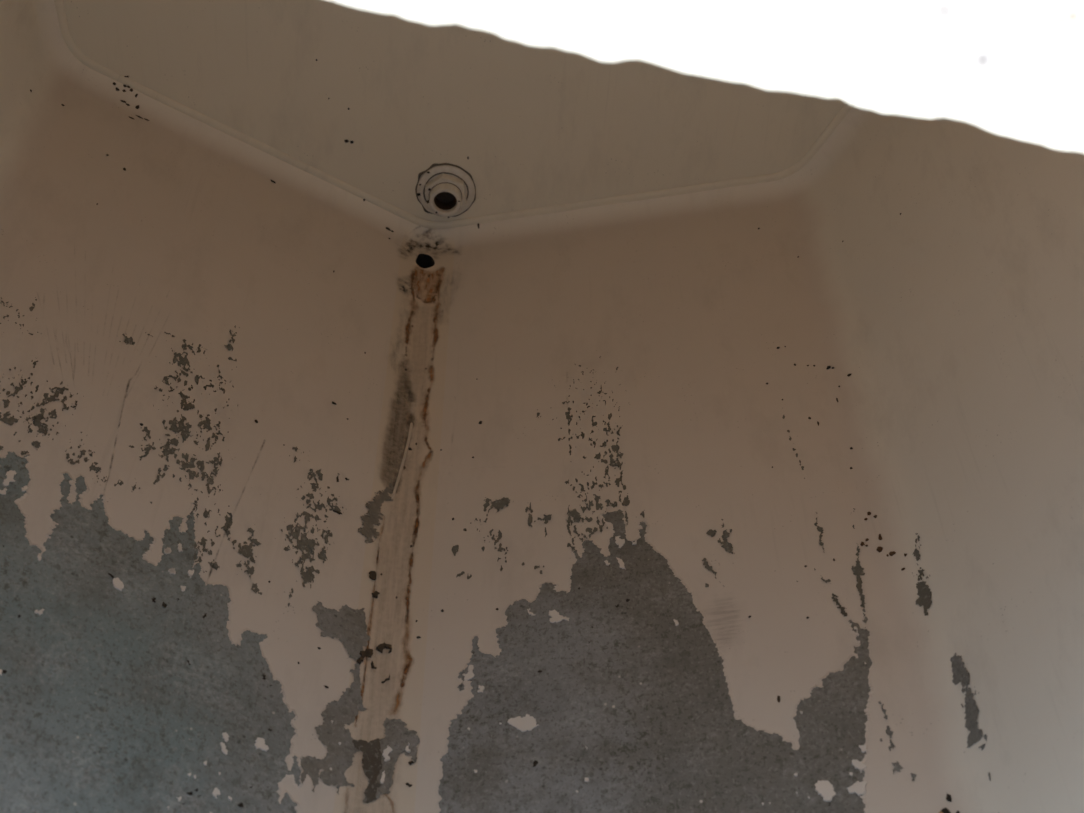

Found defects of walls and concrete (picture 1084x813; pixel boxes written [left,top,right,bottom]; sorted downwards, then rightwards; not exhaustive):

corrosion [406,269,441,356]
damp [383,362,412,490]
peeling [0,325,420,813]
corrosion [405,559,413,638]
peeling [435,365,917,813]
corrosion [395,652,412,710]
peeling [950,653,987,750]